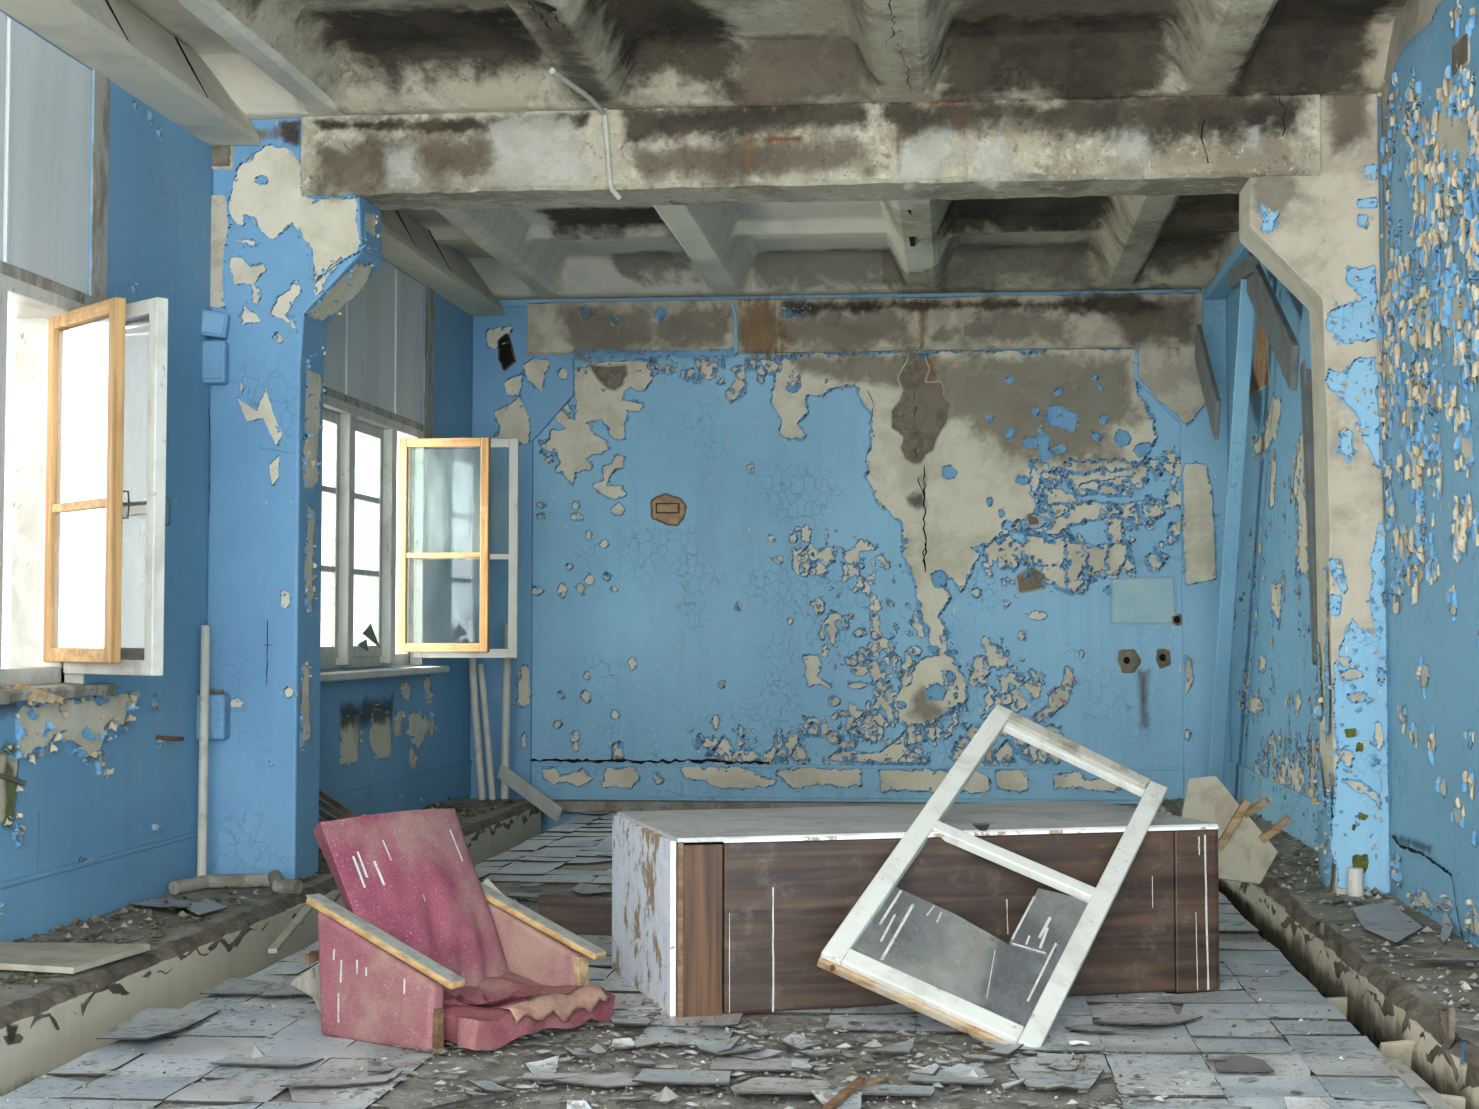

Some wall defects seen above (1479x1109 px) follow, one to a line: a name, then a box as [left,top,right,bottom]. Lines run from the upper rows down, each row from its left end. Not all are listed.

damp [280,0,1404,197]
peeling [210,143,380,344]
damp [541,207,667,239]
damp [567,307,727,358]
damp [615,251,686,280]
damp [754,176,1294,460]
peeling [485,325,1217,797]
flaking render [1233,0,1479,944]
peeling [0,685,159,849]
crack [531,757,770,765]
spalling [1239,876,1479,1090]
crack [1392,835,1463,939]